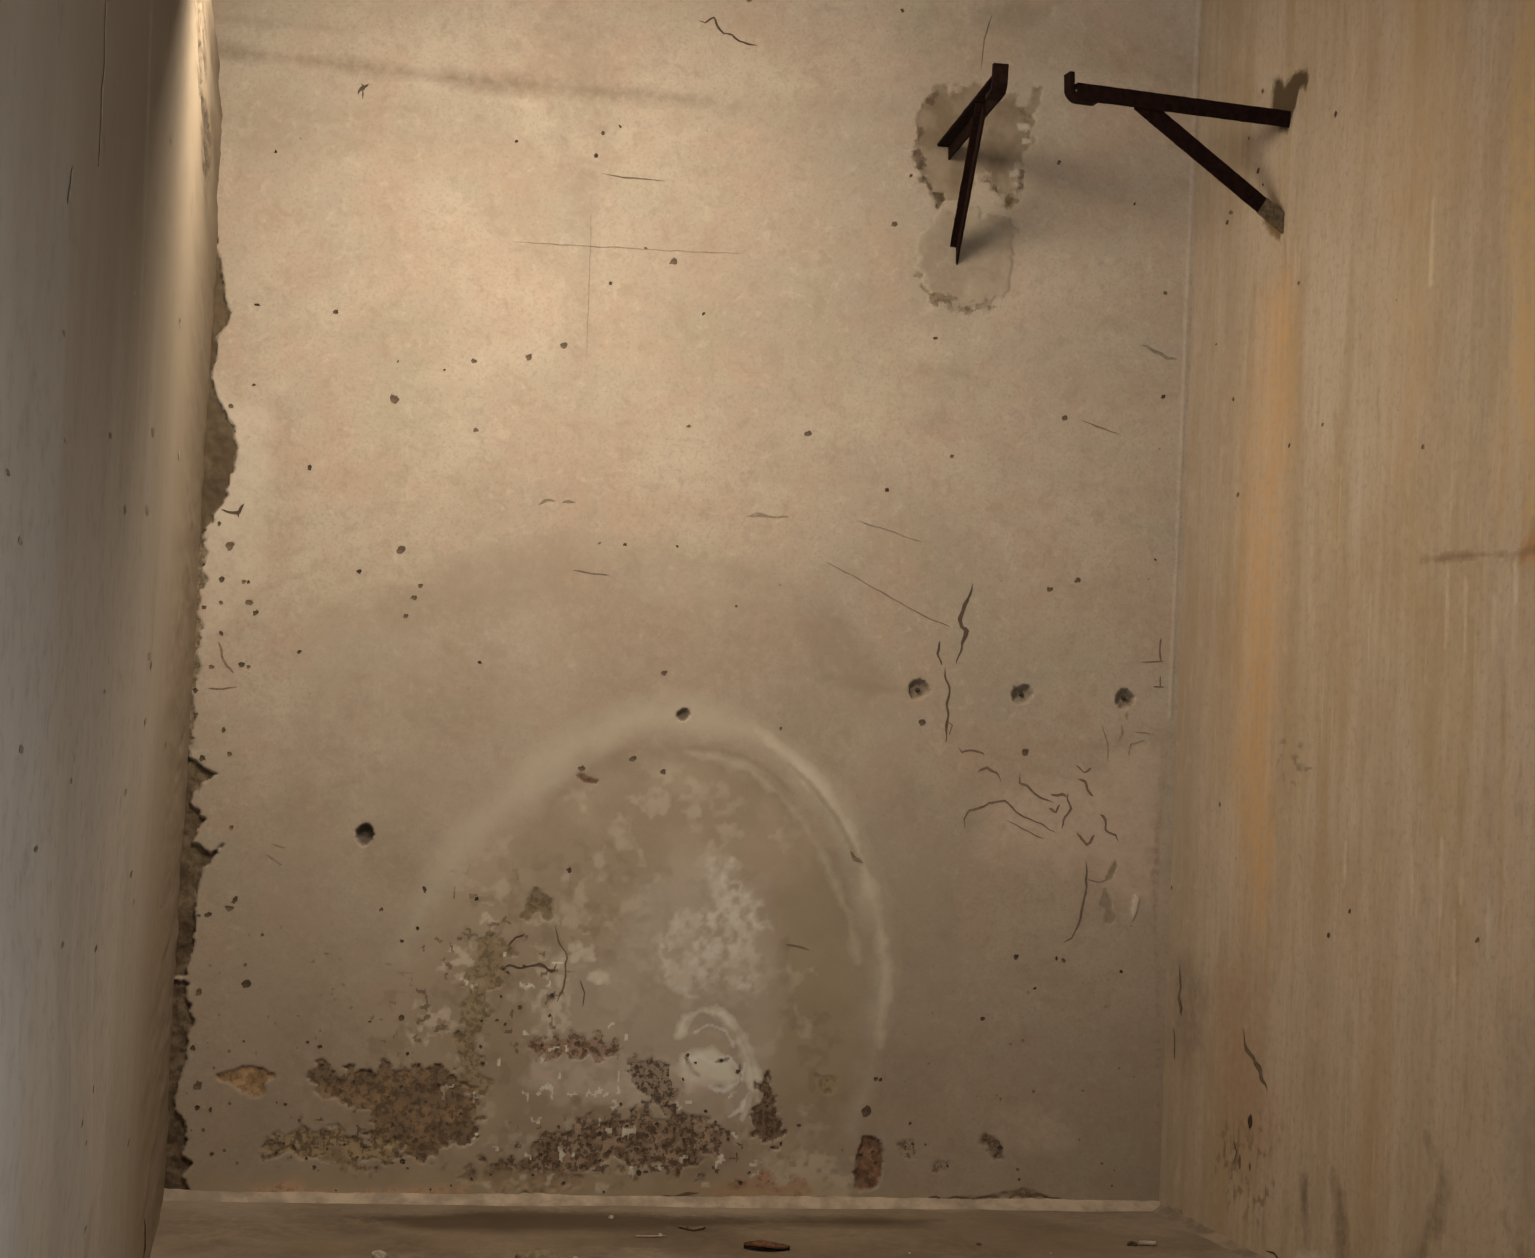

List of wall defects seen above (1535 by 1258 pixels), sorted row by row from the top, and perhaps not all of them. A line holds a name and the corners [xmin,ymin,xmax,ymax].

crack [1147,639,1163,688]
spalling [677,708,691,722]
spalling [575,765,599,784]
crack [936,583,1150,942]
spalling [355,823,375,847]
spalling [519,887,554,923]
leakage [150,520,1243,1258]
spalling [256,933,730,1186]
spalling [719,1059,801,1149]
spalling [853,1122,950,1190]
leakage [1215,1110,1353,1258]
leakage [1402,1124,1453,1258]